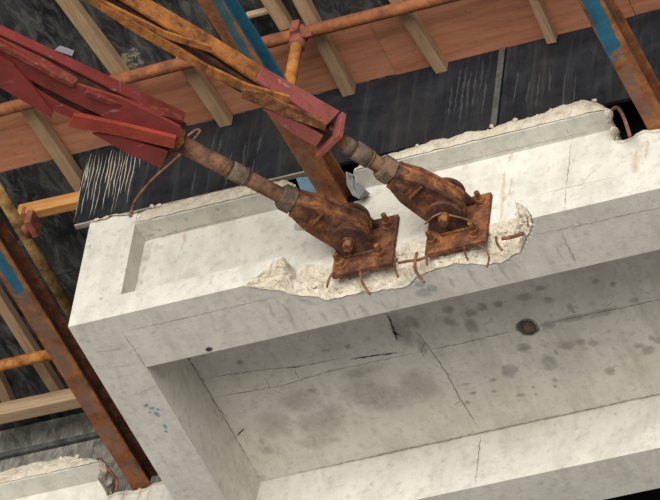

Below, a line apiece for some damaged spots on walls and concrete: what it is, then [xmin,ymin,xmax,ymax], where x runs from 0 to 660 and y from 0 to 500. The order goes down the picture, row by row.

spalling [382,99,660,159]
spalling [247,202,532,300]
crack [223,313,507,483]
spalling [0,454,163,498]